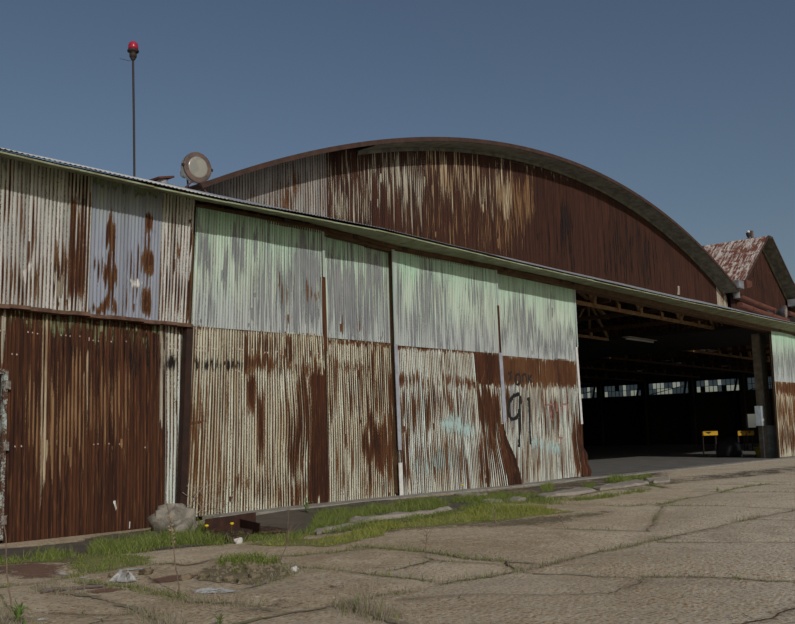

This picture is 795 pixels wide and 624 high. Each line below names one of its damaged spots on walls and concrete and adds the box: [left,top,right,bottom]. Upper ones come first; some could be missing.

rust [264,163,326,217]
rust [1,159,224,335]
rust [187,299,582,516]
rust [776,381,795,456]
crack [742,608,795,624]